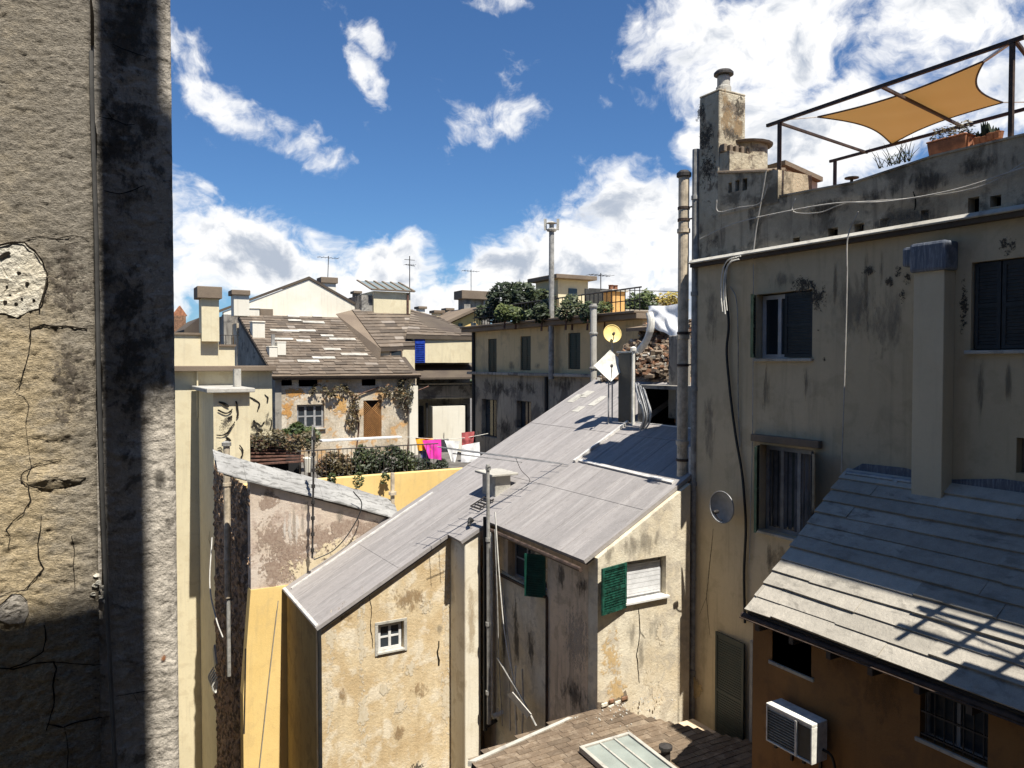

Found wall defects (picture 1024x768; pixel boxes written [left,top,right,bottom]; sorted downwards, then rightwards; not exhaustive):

spalling [0,241,49,318]
crack [0,321,87,597]
flaking render [250,492,380,587]
spalling [0,594,29,624]
crack [0,625,102,766]